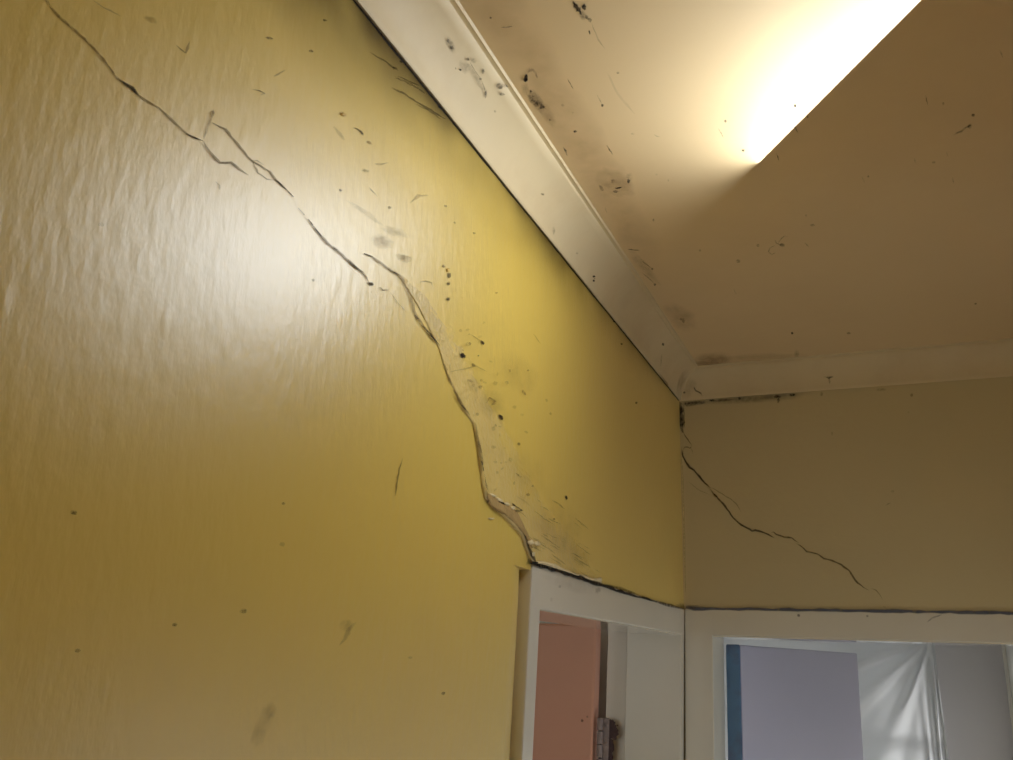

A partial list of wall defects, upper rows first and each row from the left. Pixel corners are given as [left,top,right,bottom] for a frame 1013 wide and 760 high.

crack [46,0,294,197]
crack [308,219,437,342]
crack [353,0,1013,615]
flaking render [487,493,602,583]